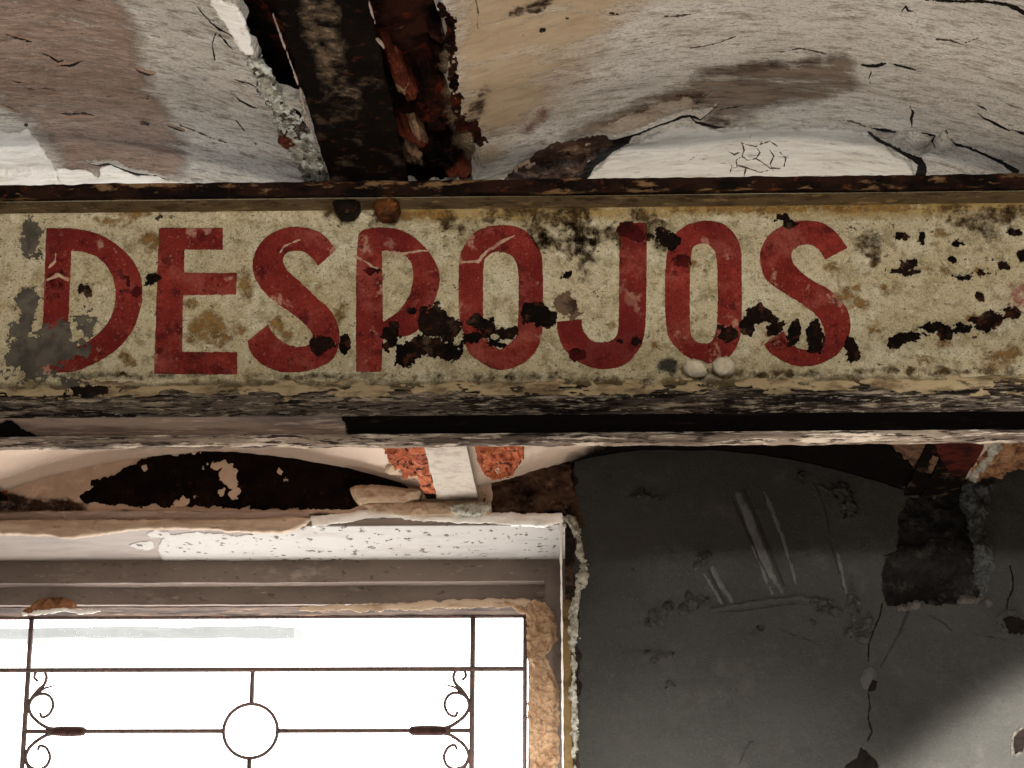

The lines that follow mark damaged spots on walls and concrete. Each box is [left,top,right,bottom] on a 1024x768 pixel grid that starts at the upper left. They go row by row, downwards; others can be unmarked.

peeling [0,123,185,186]
spalling [210,0,328,182]
spalling [379,2,489,180]
crack [608,91,787,176]
water stain [570,56,855,141]
crack [838,101,1024,175]
peeling [380,270,584,369]
peeling [884,239,1024,350]
spalling [881,443,1024,636]
peeling [79,446,589,768]
crack [867,602,959,668]
crack [866,693,874,741]